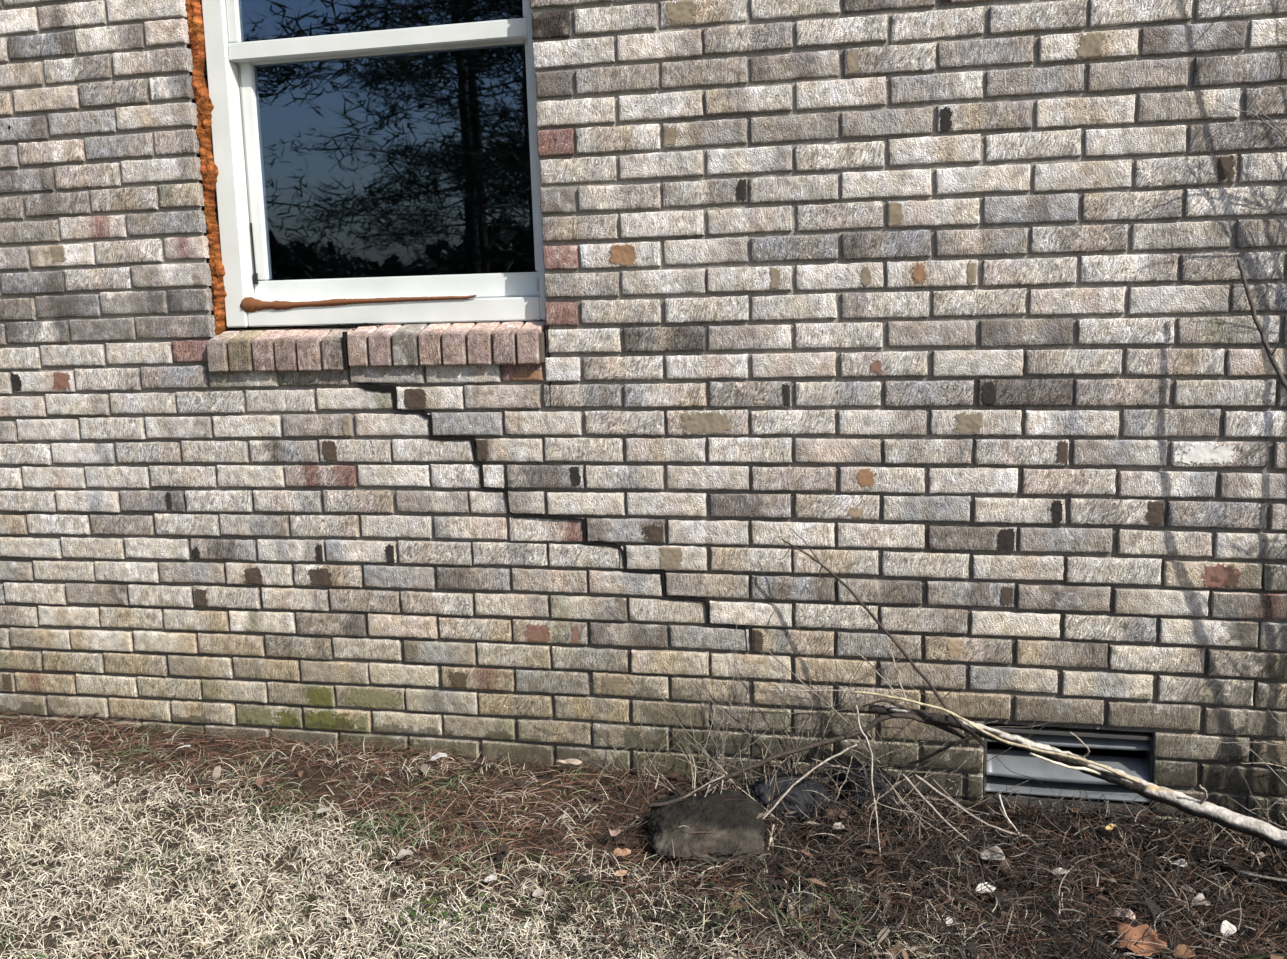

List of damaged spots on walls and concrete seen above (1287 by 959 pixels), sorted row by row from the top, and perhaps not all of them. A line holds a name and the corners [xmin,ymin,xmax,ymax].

crack [312,323,748,652]